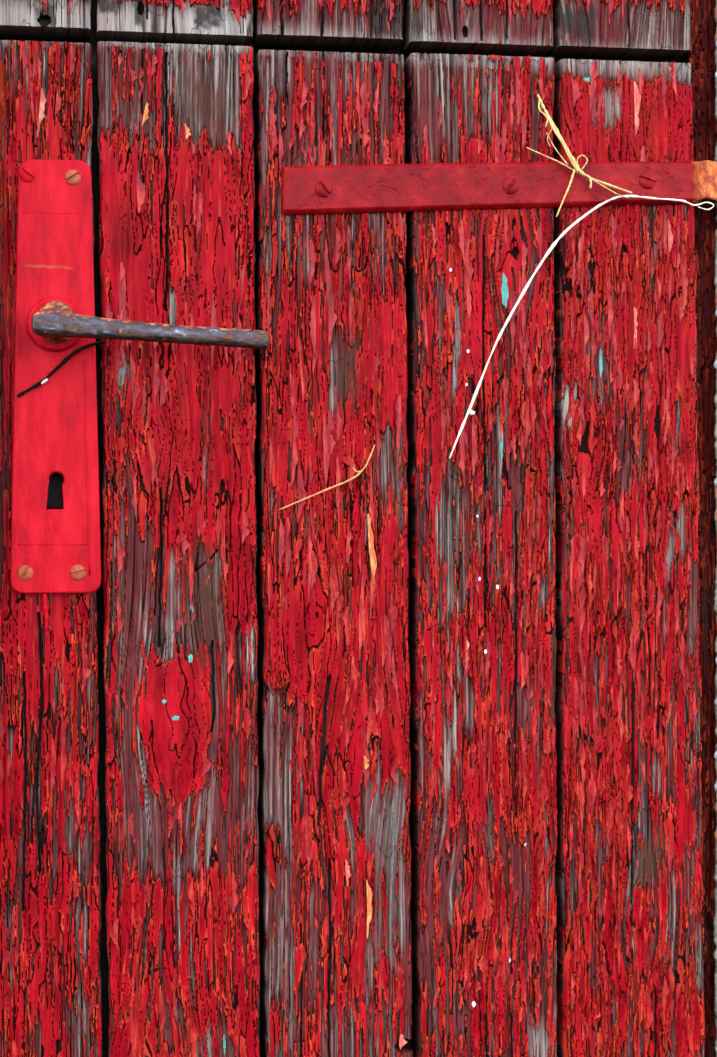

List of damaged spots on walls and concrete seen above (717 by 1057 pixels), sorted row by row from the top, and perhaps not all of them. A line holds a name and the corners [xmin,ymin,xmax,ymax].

peeling [0,0,691,325]
peeling [0,199,705,1057]